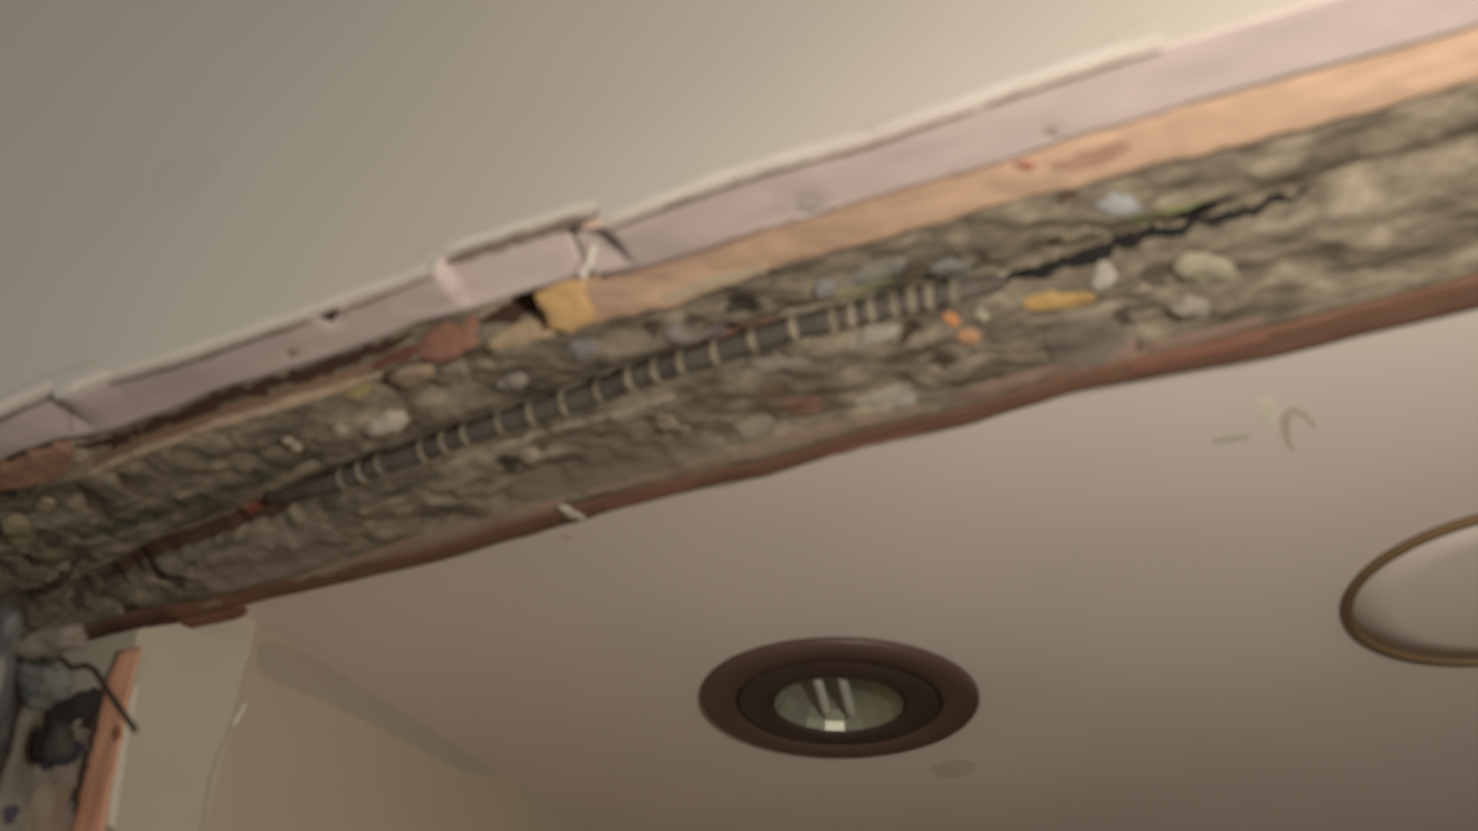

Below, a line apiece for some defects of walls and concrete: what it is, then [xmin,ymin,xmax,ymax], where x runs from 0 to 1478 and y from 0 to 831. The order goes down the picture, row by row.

peeling [444,35,1162,250]
crack [1067,103,1185,140]
crack [0,50,1163,450]
spalling [1139,262,1166,287]
crack [1004,187,1309,283]
peeling [0,265,427,411]
spalling [263,240,1007,504]
spalling [557,505,586,525]
spalling [149,563,186,592]
peeling [0,593,89,686]
spalling [28,687,104,771]
peeling [104,685,138,831]